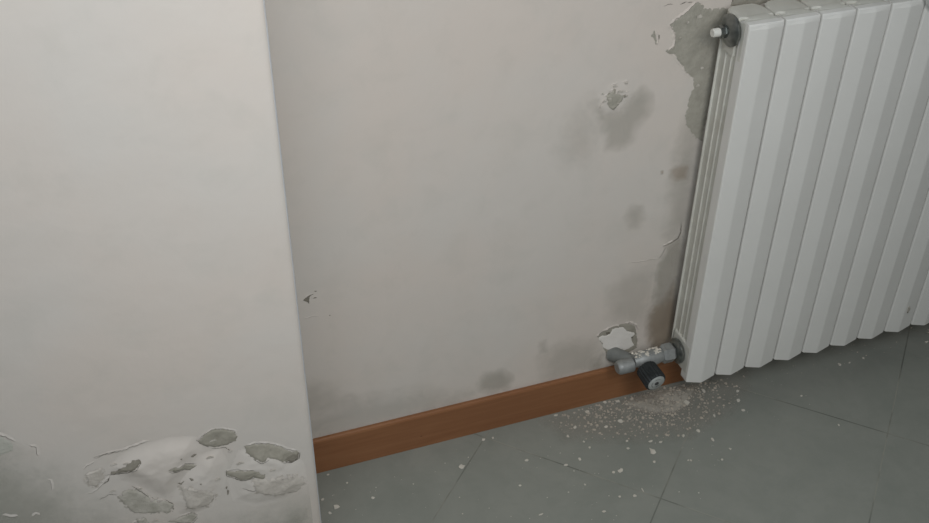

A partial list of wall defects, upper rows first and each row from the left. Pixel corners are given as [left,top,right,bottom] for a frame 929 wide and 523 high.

flaking render [651,0,770,141]
flaking render [596,321,639,353]